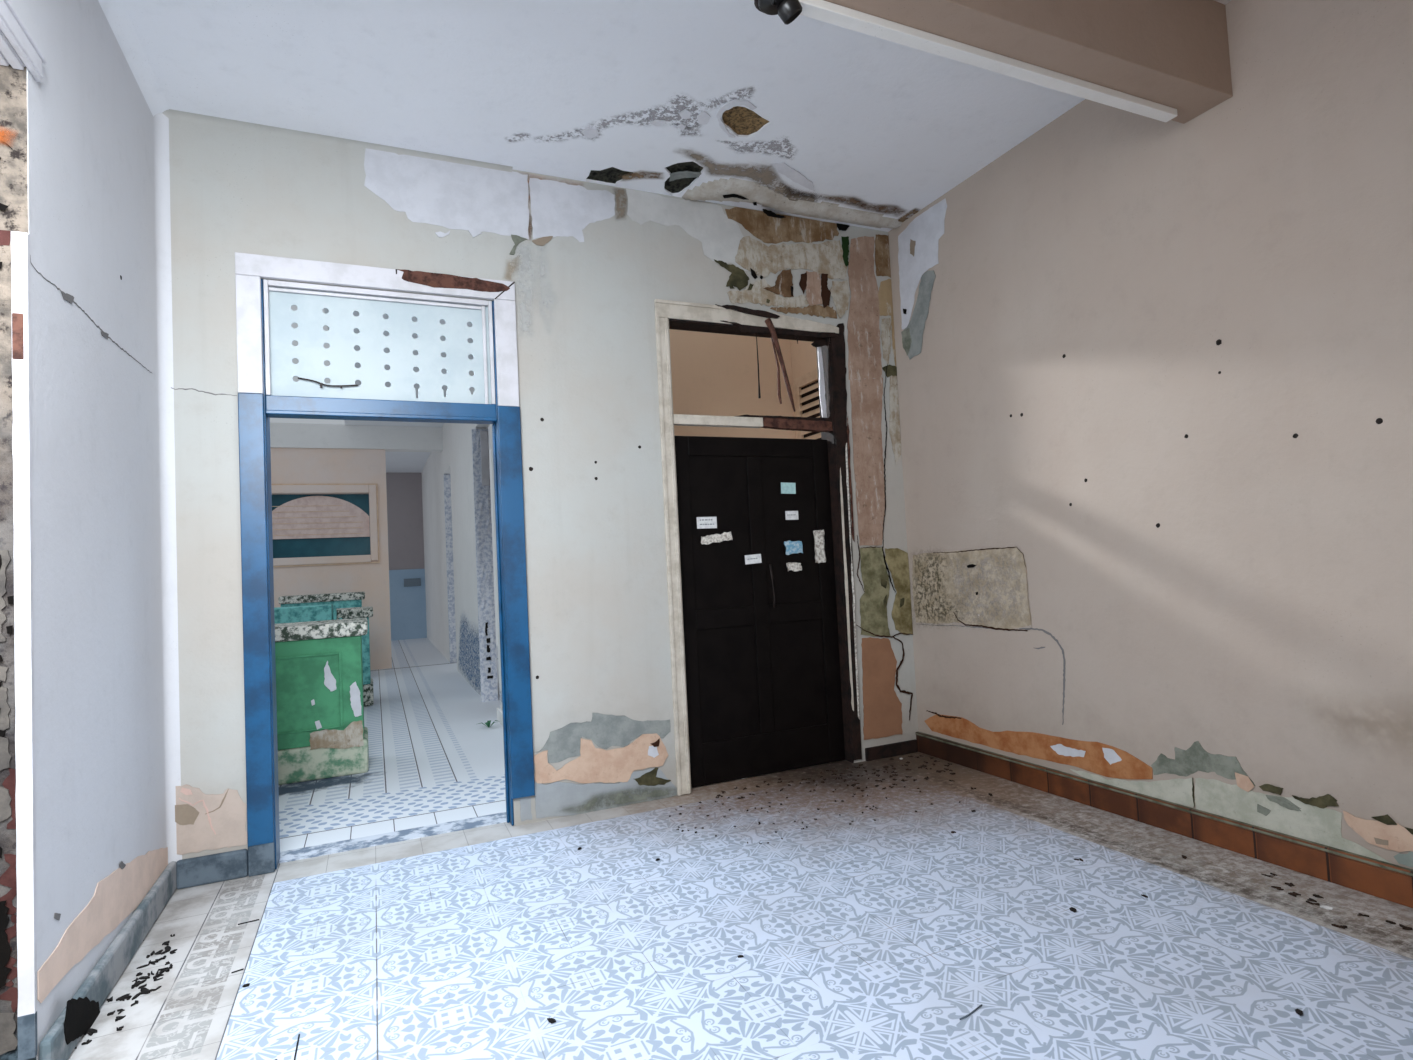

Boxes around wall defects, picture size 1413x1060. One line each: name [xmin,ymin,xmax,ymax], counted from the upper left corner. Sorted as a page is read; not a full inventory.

flaking render [650,99,769,138]
flaking render [0,230,11,269]
crack [30,255,237,396]
peeling [364,148,947,546]
spalling [0,550,16,829]
flaking render [519,713,677,821]
flaking render [861,637,903,740]
flaking render [925,710,1413,868]
flaking render [0,847,18,1055]
peeling [37,784,247,1003]